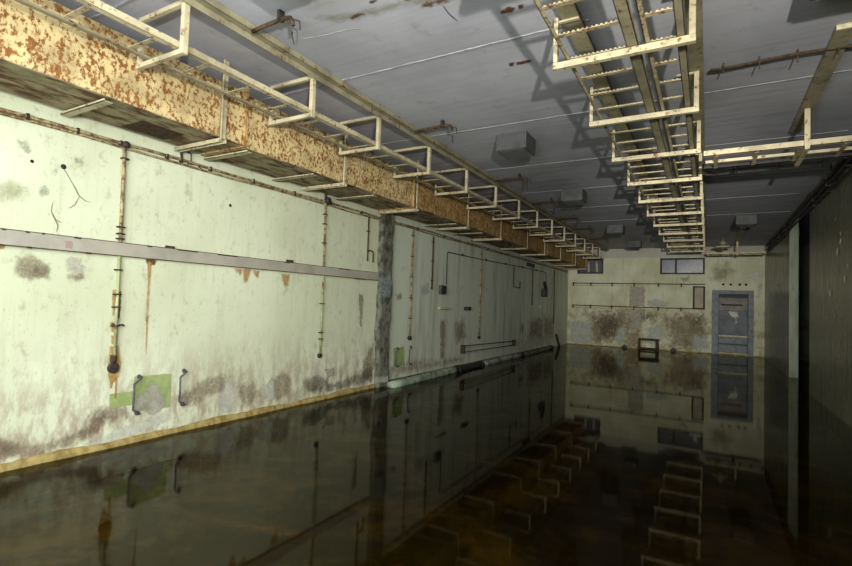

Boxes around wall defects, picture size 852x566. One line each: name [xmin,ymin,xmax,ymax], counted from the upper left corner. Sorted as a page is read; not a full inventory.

corrosion [0,228,379,341]
leakage [307,349,388,389]
leakage [0,409,169,457]